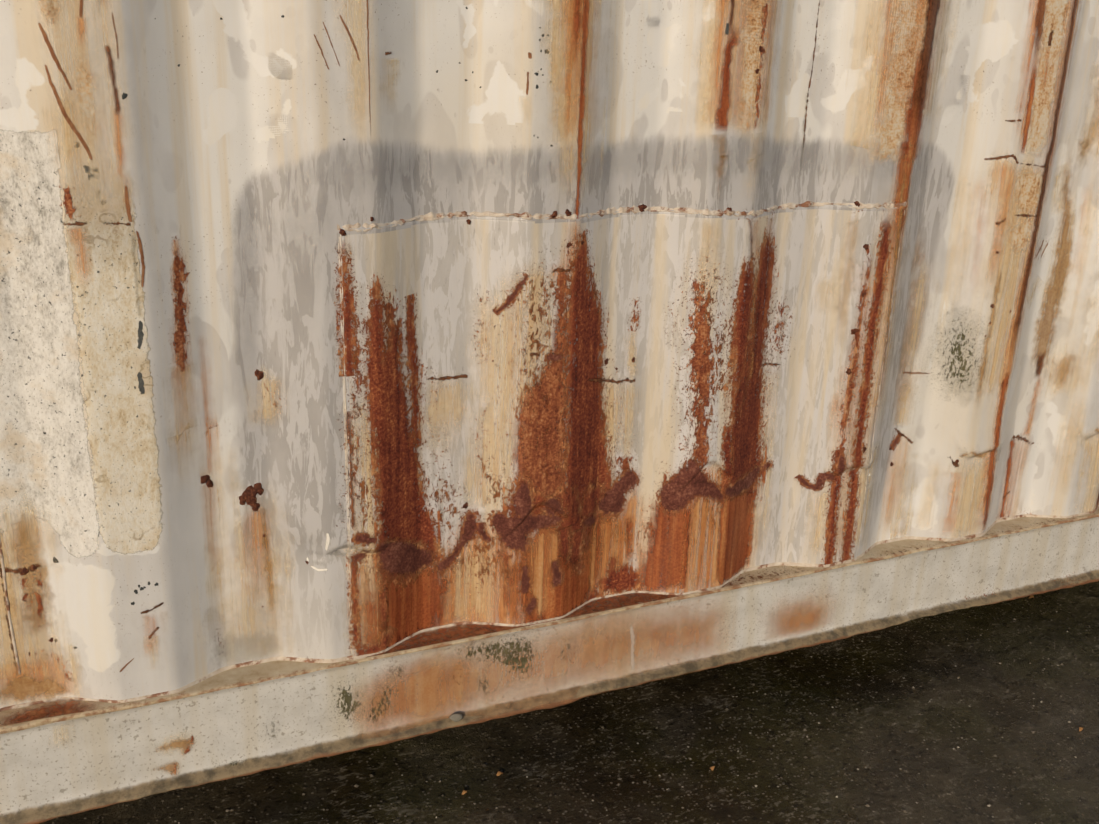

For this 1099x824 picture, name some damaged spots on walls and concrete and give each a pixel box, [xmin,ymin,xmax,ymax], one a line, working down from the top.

peeling [0,47,168,678]
rust [169,236,190,372]
rust [333,0,798,657]
rust [794,0,940,565]
rust [980,0,1079,535]